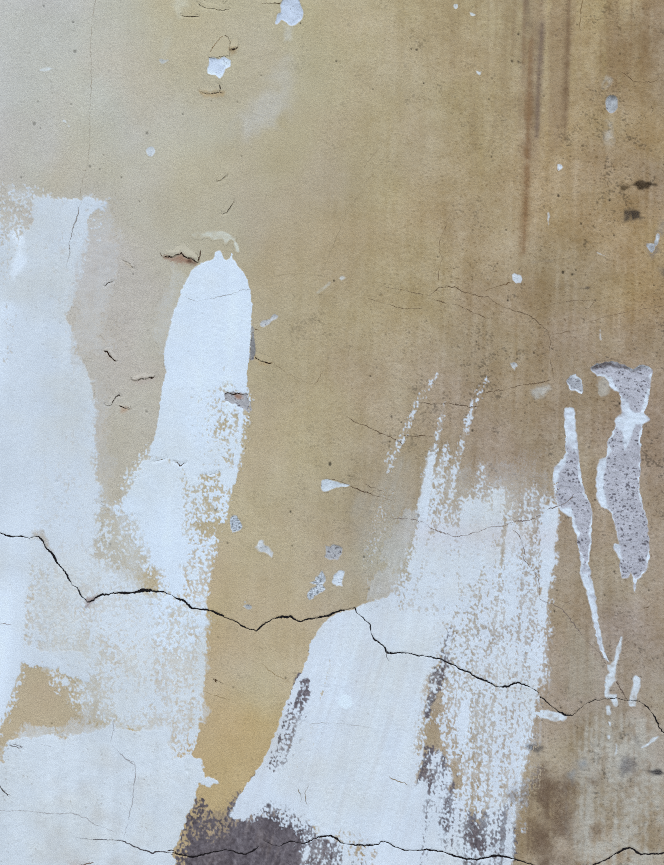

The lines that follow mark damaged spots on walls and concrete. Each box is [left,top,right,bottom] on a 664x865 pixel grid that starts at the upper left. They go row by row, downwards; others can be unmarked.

peeling [262,0,304,27]
spalling [197,35,240,100]
water stain [413,0,664,258]
peeling [160,242,201,268]
spalling [565,373,612,399]
crack [345,415,425,444]
spalling [306,543,346,601]
crack [395,494,608,662]
crack [1,533,664,733]
crack [0,724,533,865]
crack [593,847,664,865]